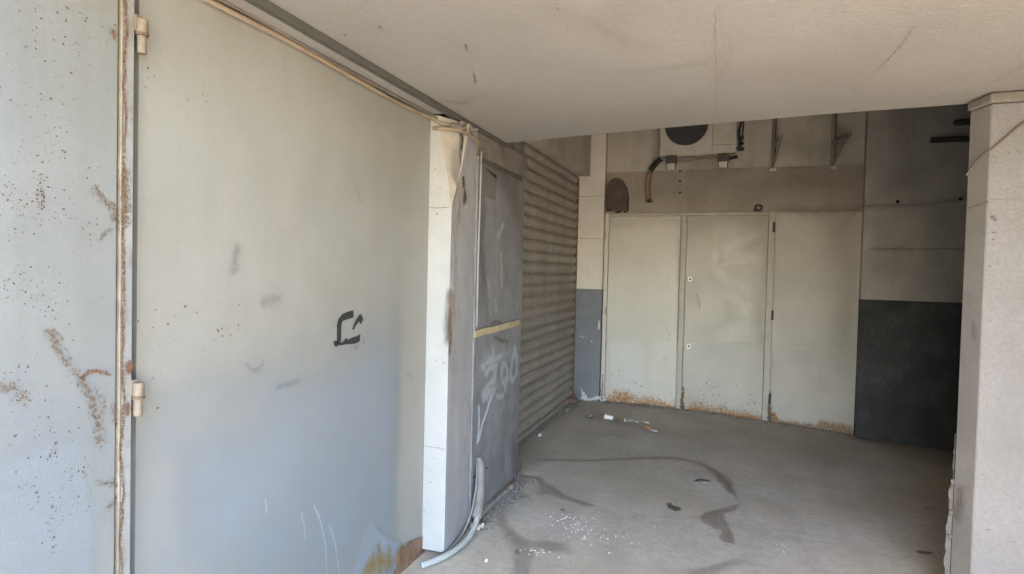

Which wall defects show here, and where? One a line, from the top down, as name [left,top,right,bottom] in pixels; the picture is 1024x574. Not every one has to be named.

rust [0,0,144,574]
rust [601,374,854,434]
leakage [534,456,743,545]